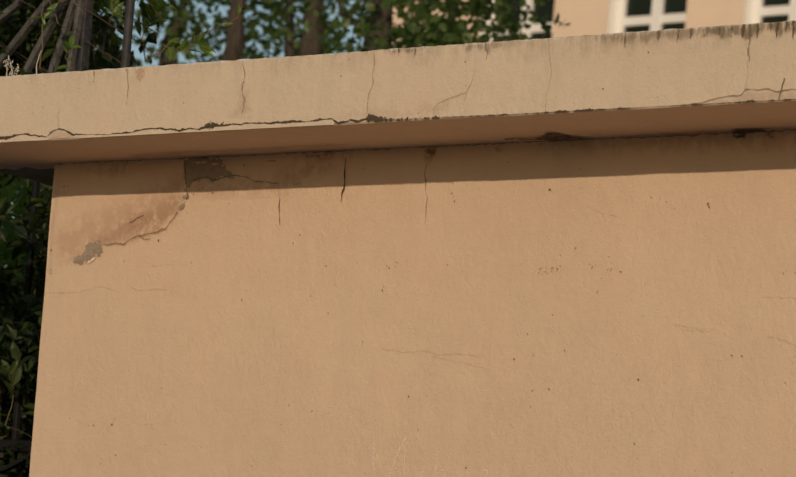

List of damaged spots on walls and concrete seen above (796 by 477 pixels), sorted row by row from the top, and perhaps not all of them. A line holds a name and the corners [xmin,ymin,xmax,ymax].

damp [706,21,796,61]
crack [671,88,796,106]
crack [444,107,632,118]
crack [0,118,367,143]
peeling [178,157,233,210]
peeling [73,240,103,265]